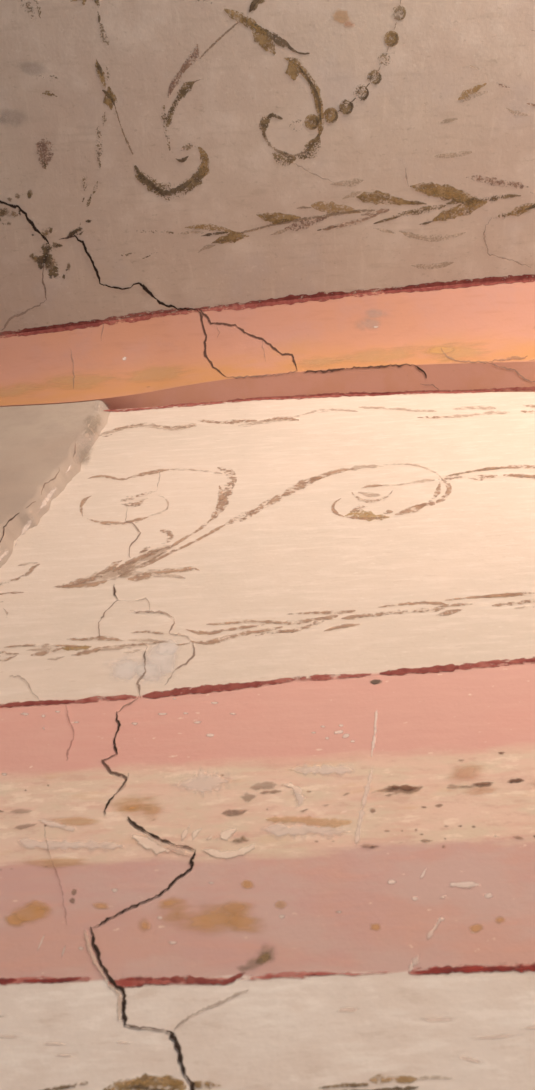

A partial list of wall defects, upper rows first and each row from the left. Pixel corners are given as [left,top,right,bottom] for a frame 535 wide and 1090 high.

crack [0,200,439,390]
crack [441,348,535,382]
crack [127,521,141,557]
crack [85,587,196,1090]